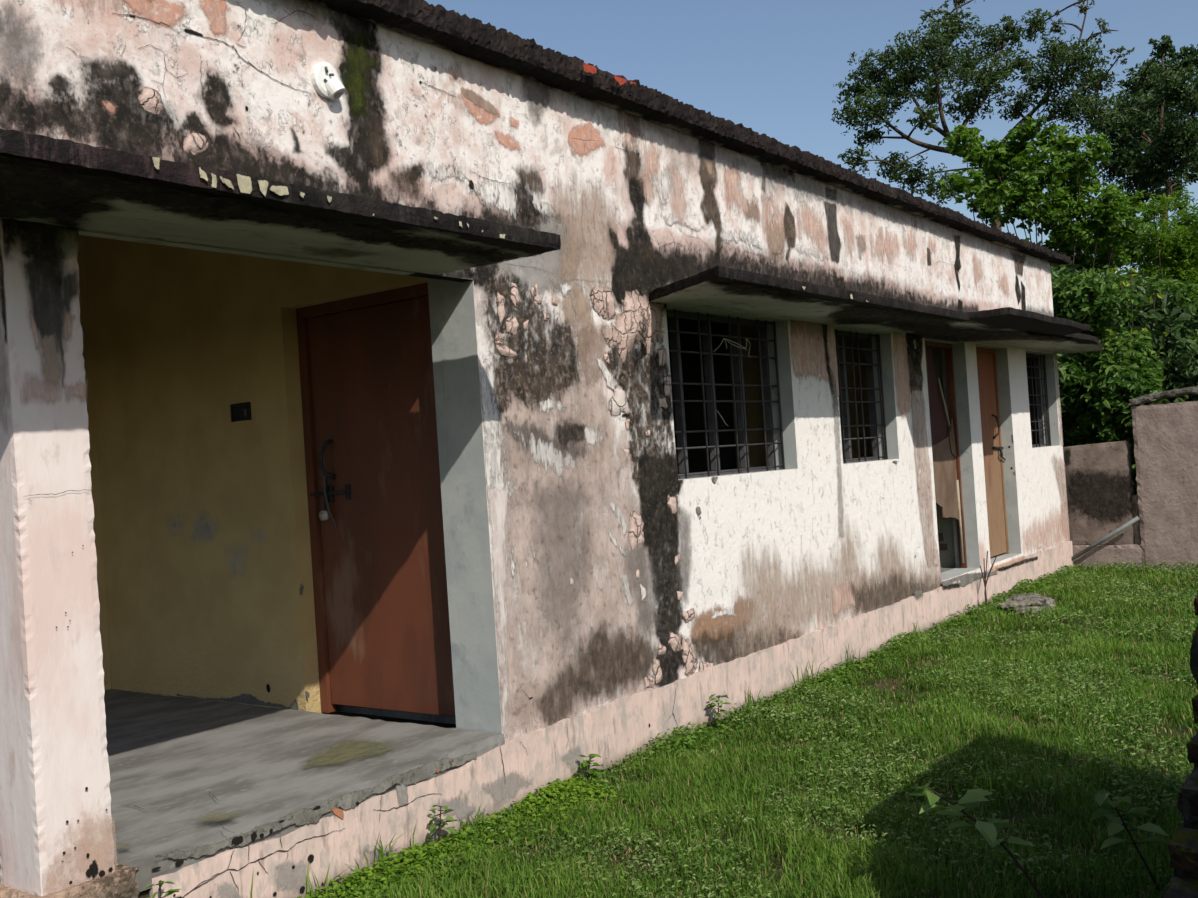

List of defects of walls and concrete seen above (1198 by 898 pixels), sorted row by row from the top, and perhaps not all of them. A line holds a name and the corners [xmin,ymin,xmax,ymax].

peeling [113,0,186,39]
peeling [200,0,229,36]
leakage [0,0,455,211]
peeling [419,68,521,151]
peeling [568,111,700,231]
peeling [560,283,606,385]
leakage [0,139,1136,740]
peeling [585,424,603,445]
crack [183,791,345,898]